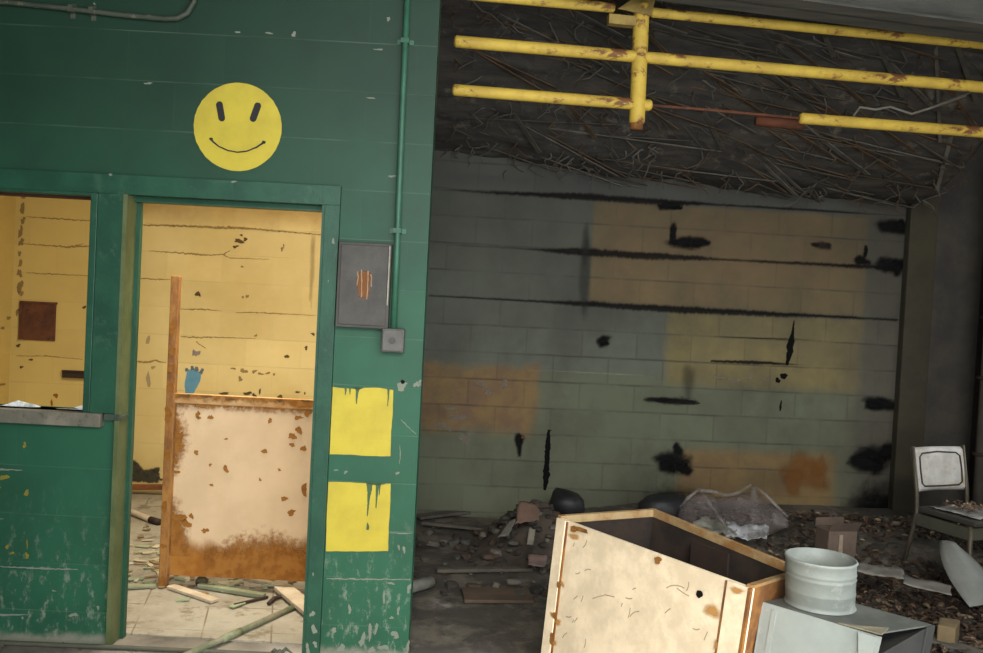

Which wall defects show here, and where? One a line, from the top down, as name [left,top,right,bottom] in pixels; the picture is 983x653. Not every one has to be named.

peeling [17,197,26,296]
rust [357,271,371,299]
crack [460,297,897,365]
peeling [231,368,275,397]
crack [543,430,551,490]
damp [660,442,693,475]
damp [848,444,892,471]
rust [158,501,307,586]
peeling [306,611,318,653]
peeling [336,623,410,653]